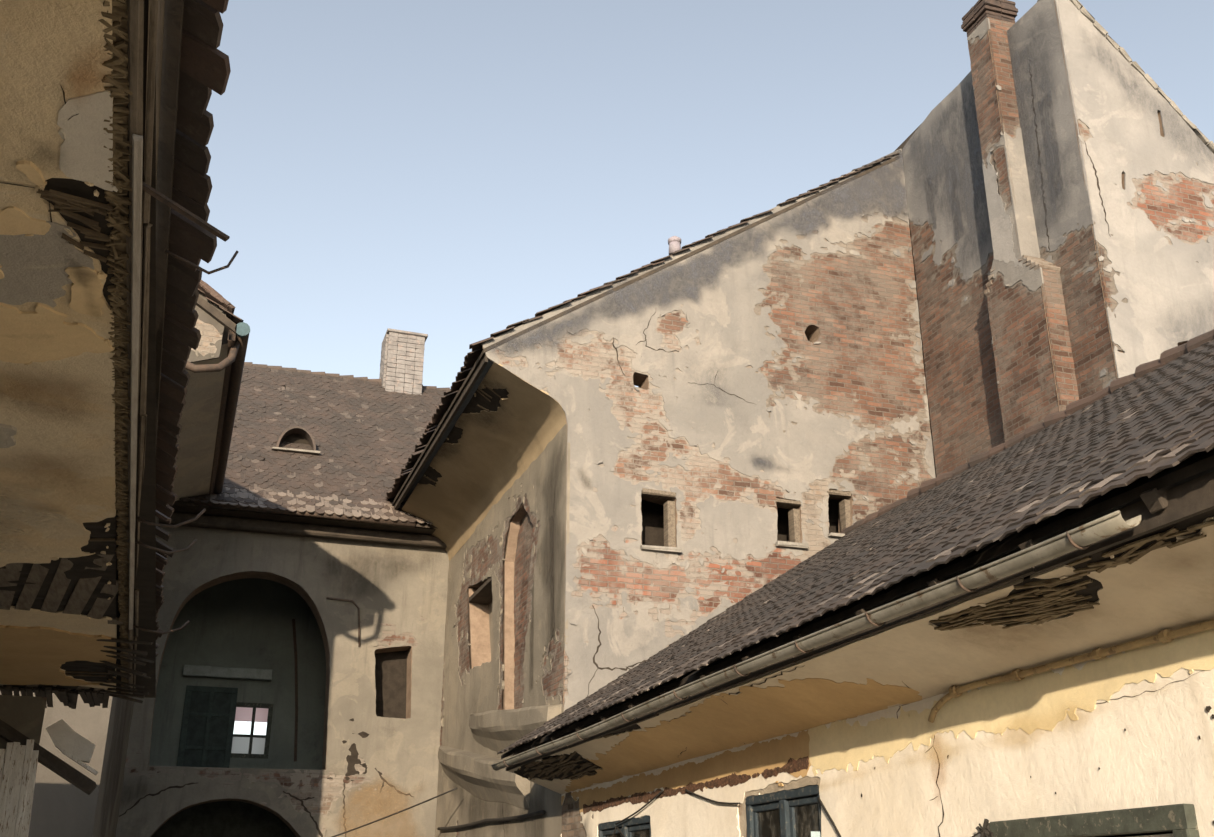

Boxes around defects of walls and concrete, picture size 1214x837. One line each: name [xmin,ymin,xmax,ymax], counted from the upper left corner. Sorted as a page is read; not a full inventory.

flaking render [16,160,47,196]
flaking render [57,90,118,197]
spalling [1127,162,1214,245]
flaking render [0,221,107,317]
crack [612,312,679,375]
spalling [495,17,1128,647]
crack [587,605,645,696]
peeling [561,628,1214,837]
crack [119,783,196,817]
crack [283,782,347,837]
crack [925,735,944,837]